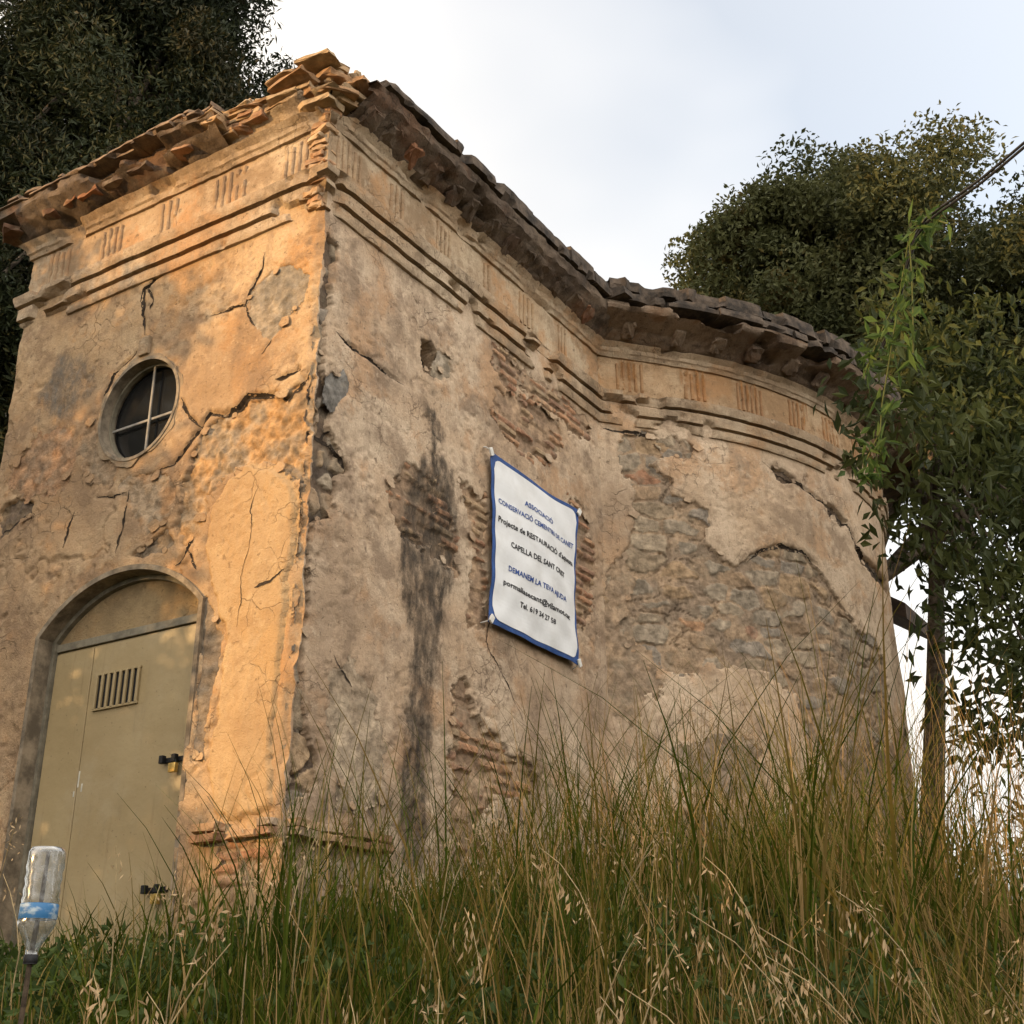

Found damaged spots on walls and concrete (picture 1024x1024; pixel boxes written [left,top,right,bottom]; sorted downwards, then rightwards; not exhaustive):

crack [104,278,159,396]
crack [160,365,314,470]
crack [212,252,271,352]
peeling [424,350,454,380]
spalling [490,342,593,471]
crack [96,491,129,551]
spalling [75,241,394,915]
crack [237,490,283,619]
leakage [400,409,457,866]
spalling [385,462,489,630]
spalling [566,431,919,854]
spalling [446,678,535,868]